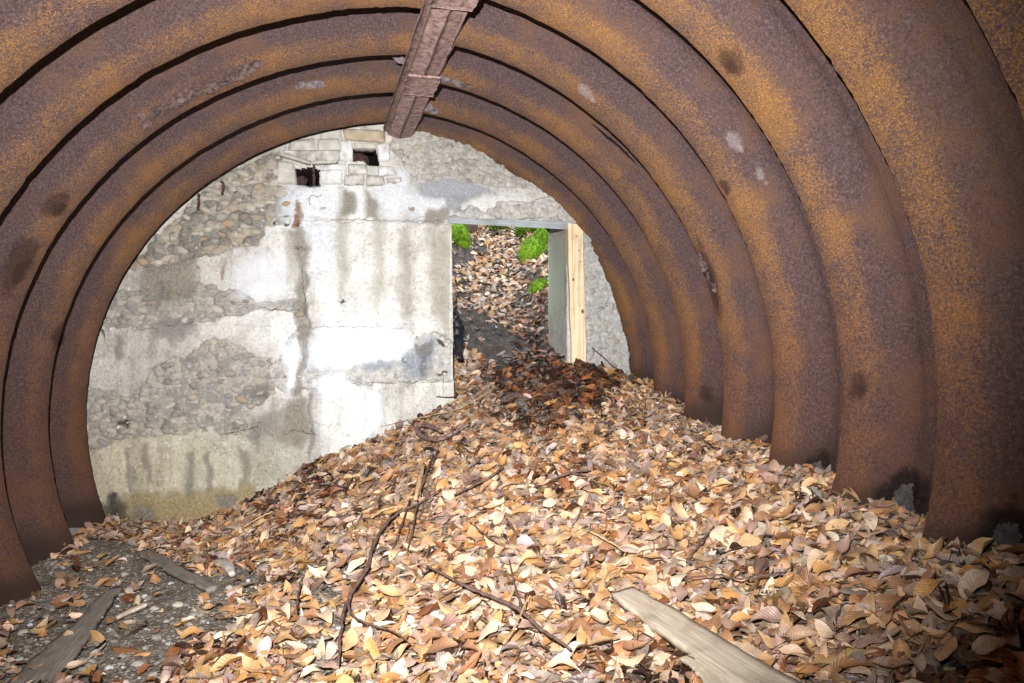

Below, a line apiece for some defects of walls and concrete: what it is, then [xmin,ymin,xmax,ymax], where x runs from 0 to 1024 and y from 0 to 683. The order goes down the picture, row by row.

rust [136,60,265,129]
rust [295,80,325,89]
rust [440,75,472,88]
water stain [277,171,450,446]
water stain [102,449,254,524]